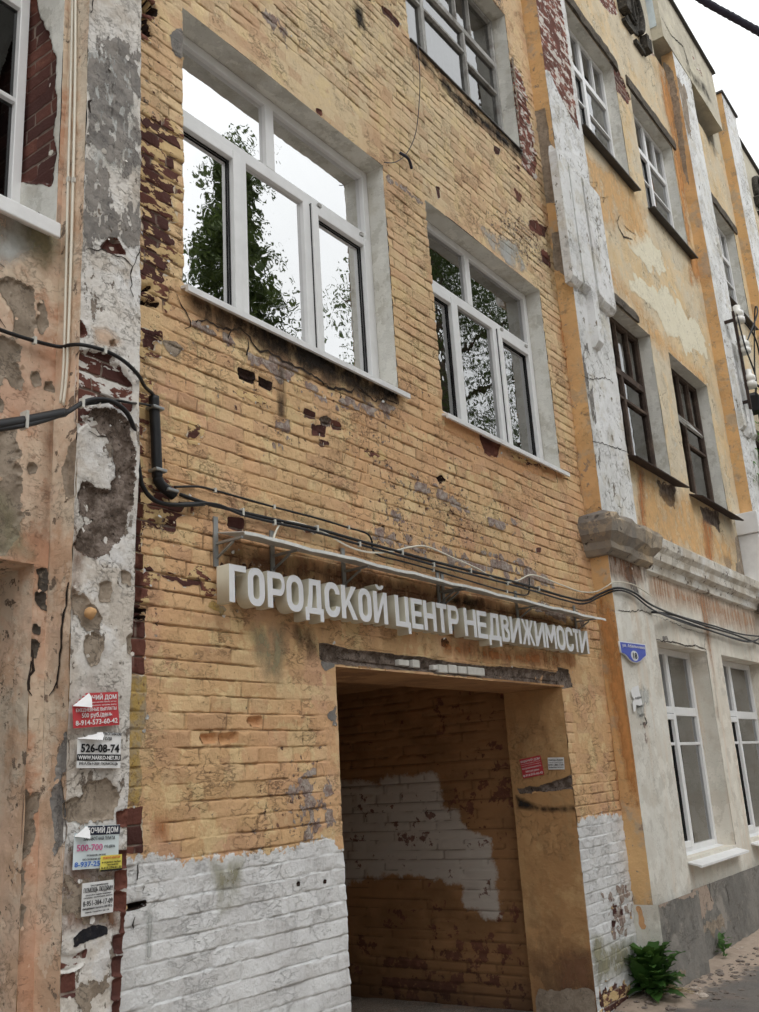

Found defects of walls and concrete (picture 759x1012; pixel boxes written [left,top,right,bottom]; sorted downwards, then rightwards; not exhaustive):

flaking render [599,0,618,15]
flaking render [21,0,57,187]
flaking render [536,0,580,129]
flaking render [83,0,184,313]
flaking render [76,315,89,337]
flaking render [139,327,183,362]
peeling [191,321,235,351]
peeling [237,352,396,450]
spalling [0,429,38,556]
spalling [19,349,238,1012]
peeling [601,885,646,940]